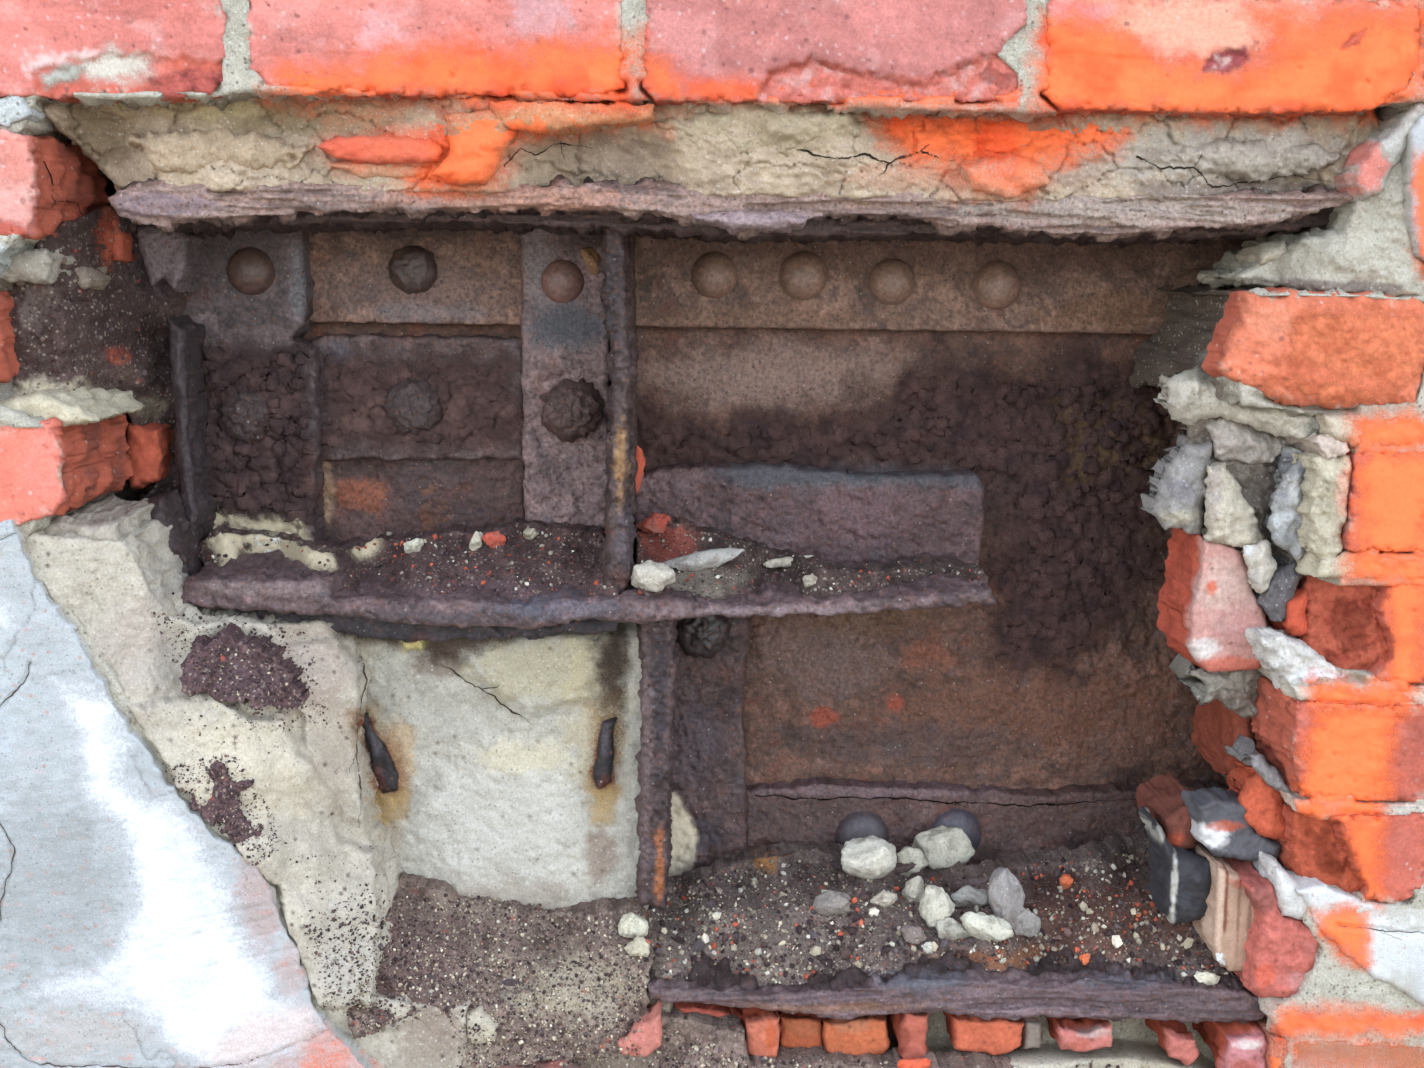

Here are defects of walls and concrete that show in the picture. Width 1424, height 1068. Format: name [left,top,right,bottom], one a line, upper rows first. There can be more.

spalling [42,54,1424,408]
corrosion [147,314,520,576]
corrosion [636,343,1169,679]
crack [0,662,31,706]
flaking render [26,519,471,1068]
corrosion [349,706,408,826]
corrosion [587,627,630,823]
spalling [1300,575,1394,670]
crack [0,824,15,920]
spalling [1223,857,1319,998]
crack [0,1024,128,1068]
crack [199,1029,329,1068]